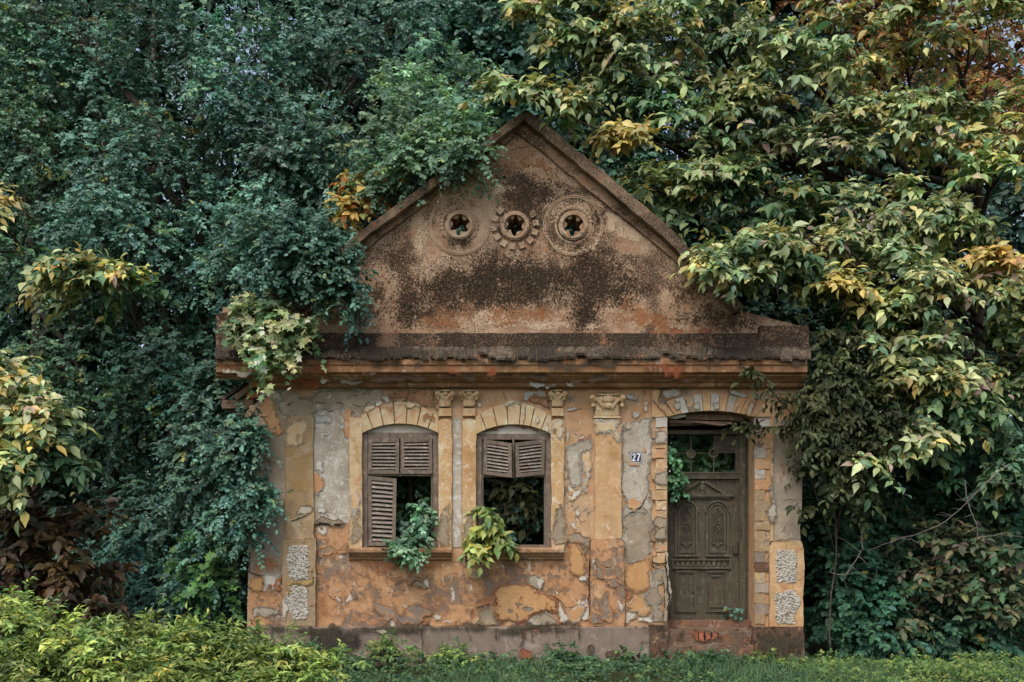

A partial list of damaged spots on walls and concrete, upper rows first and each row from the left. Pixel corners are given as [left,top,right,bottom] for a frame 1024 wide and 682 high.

damp [412,218,434,257]
damp [574,198,658,255]
damp [457,307,652,333]
peeling [296,459,336,535]
flaking render [469,382,669,634]